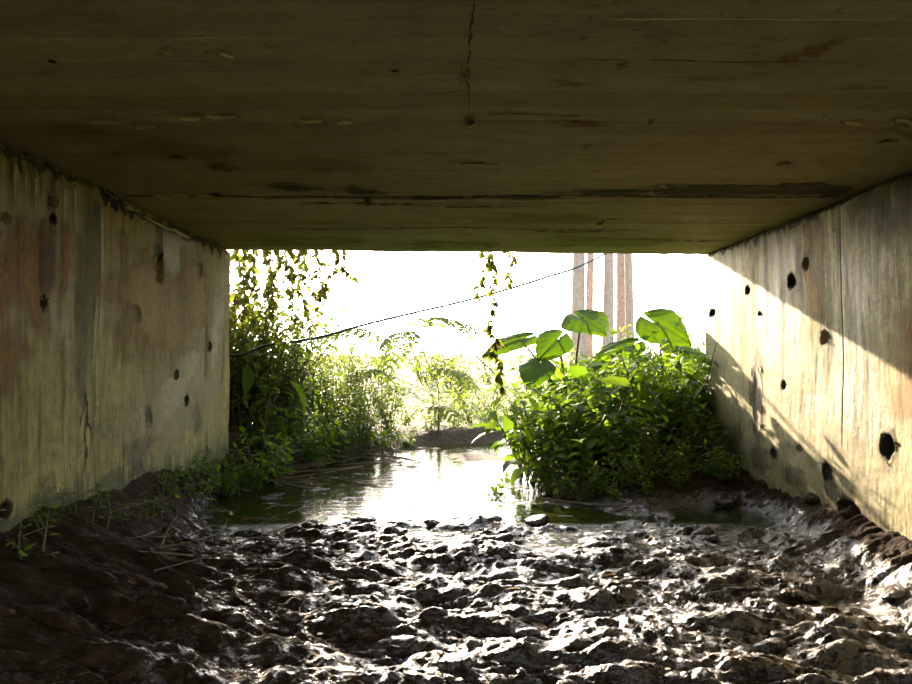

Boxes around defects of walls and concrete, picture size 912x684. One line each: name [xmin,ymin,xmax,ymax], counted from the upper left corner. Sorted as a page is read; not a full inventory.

crack [427,0,601,125]
damp [491,182,854,200]
damp [821,207,837,329]
crack [80,386,93,468]